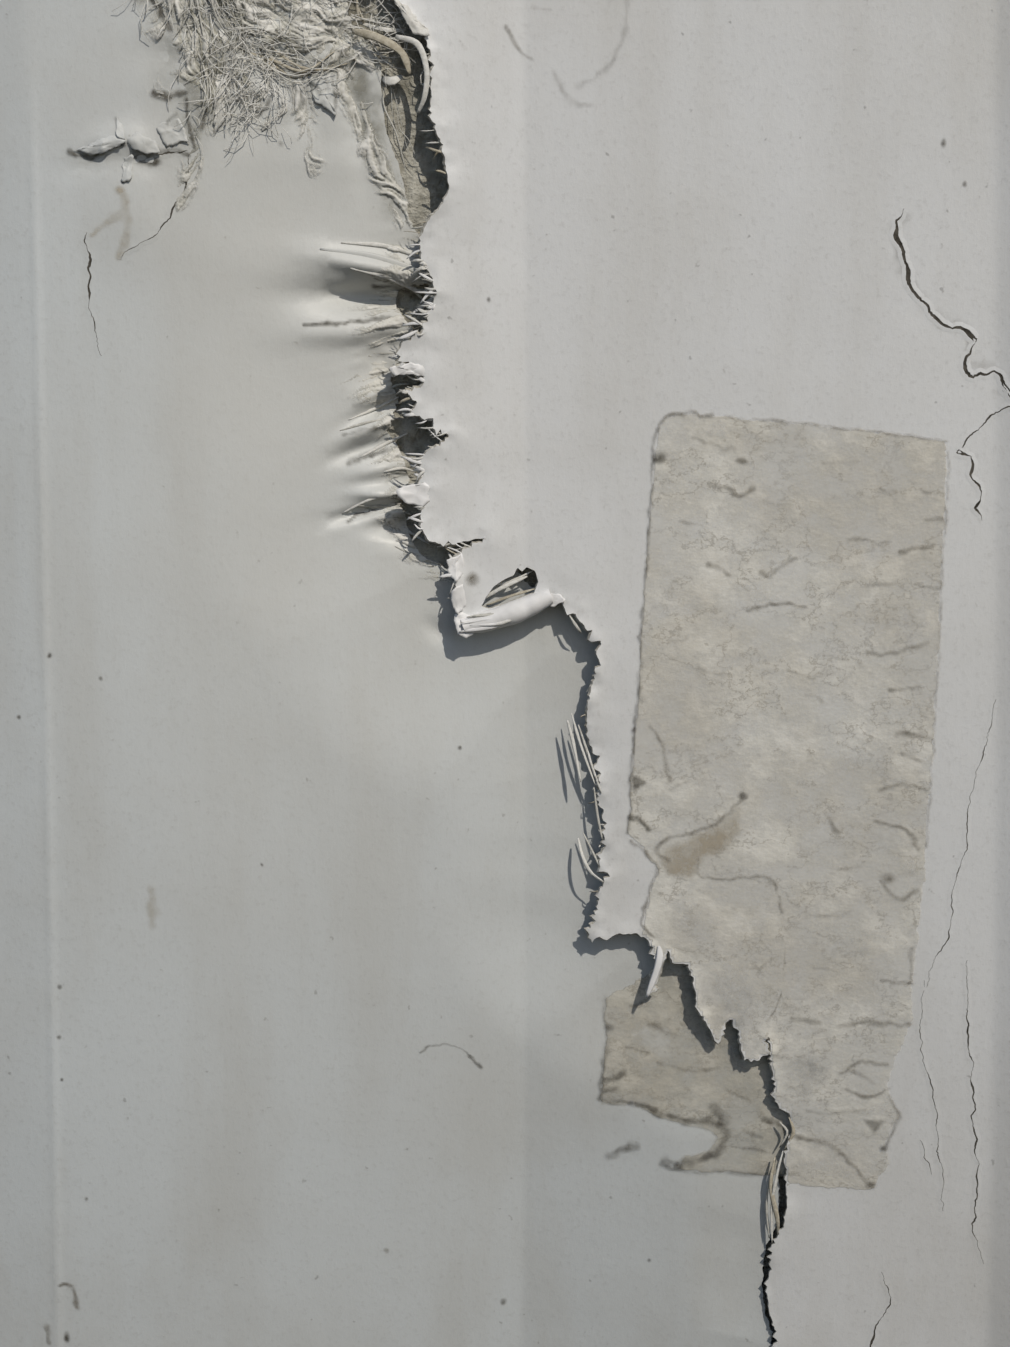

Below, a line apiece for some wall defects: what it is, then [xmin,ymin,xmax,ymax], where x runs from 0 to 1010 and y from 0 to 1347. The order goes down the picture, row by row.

peeling [394,0,430,37]
peeling [213,29,268,134]
peeling [309,73,336,117]
crack [889,206,1010,521]
crack [915,698,999,1265]